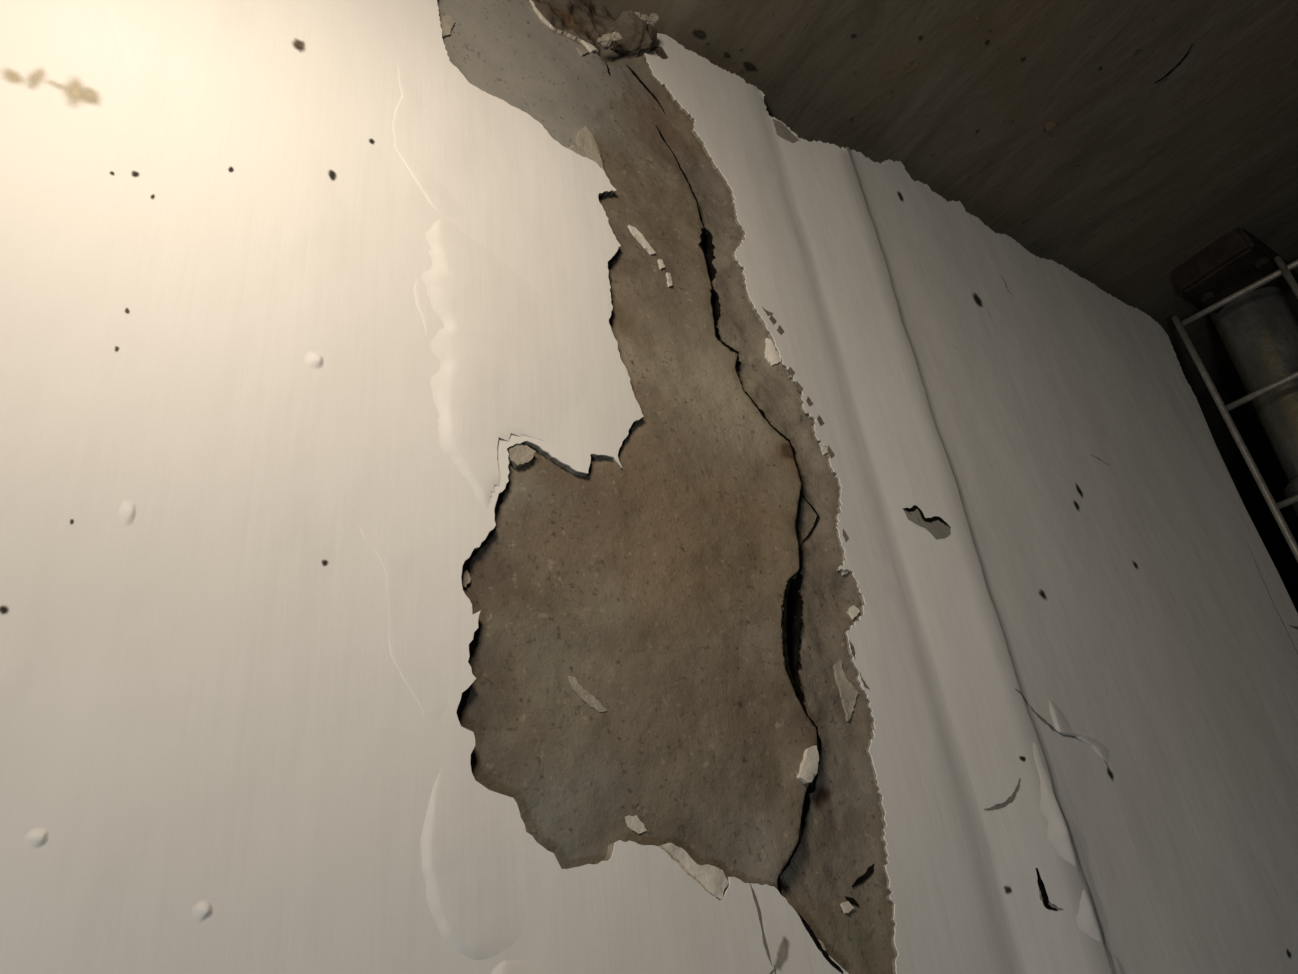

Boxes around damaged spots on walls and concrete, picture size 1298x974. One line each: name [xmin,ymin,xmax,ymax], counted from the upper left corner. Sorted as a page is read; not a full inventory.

flaking render [437,0,895,974]
crack [605,62,844,974]
crack [845,864,875,907]
peeling [903,505,951,539]